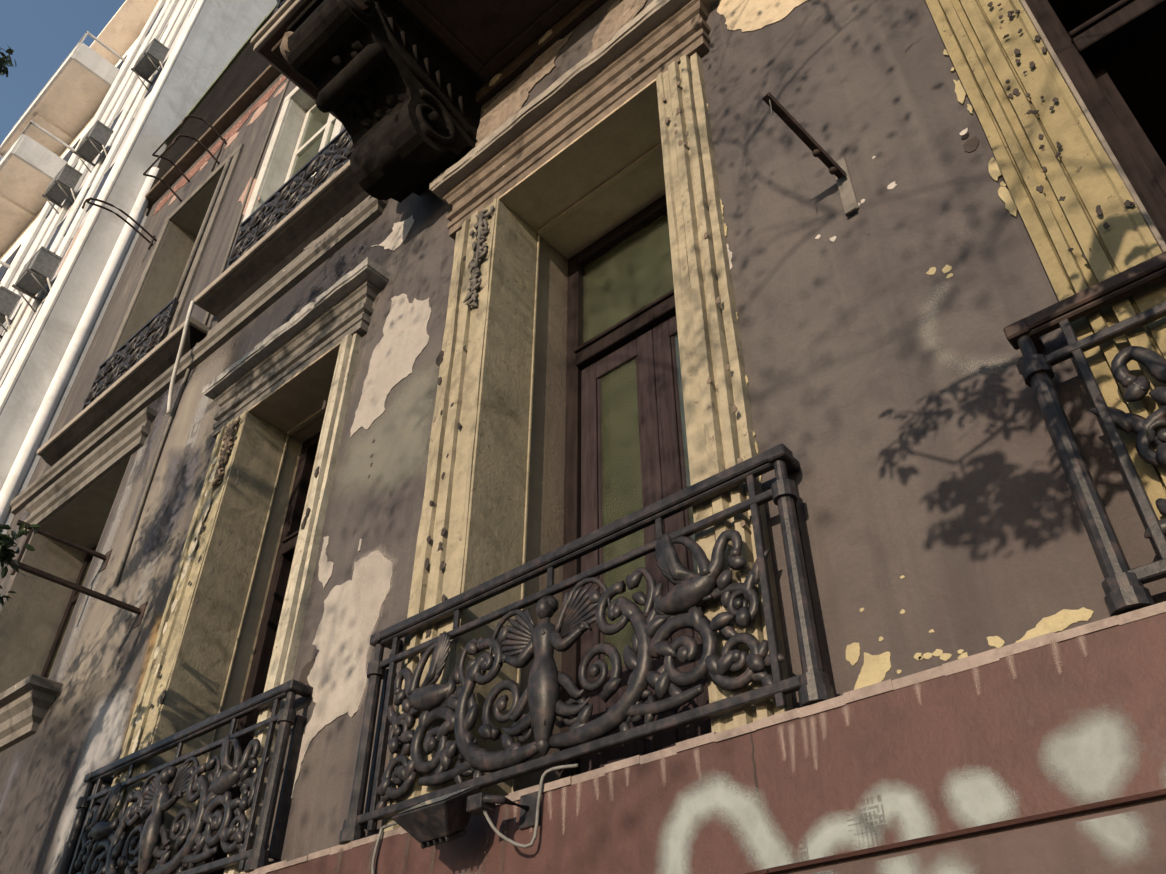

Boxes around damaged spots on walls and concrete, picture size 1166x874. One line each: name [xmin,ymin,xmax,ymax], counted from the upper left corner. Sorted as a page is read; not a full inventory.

peeling [717,0,810,33]
spalling [943,49,973,115]
spalling [988,158,1018,218]
peeling [370,215,415,251]
flaking render [926,265,953,279]
peeling [350,294,432,438]
peeling [424,527,446,570]
flaking render [987,607,1094,648]
peeling [291,536,393,800]
flaking render [846,636,902,690]
flaking render [914,649,968,661]
leakage [780,714,825,768]